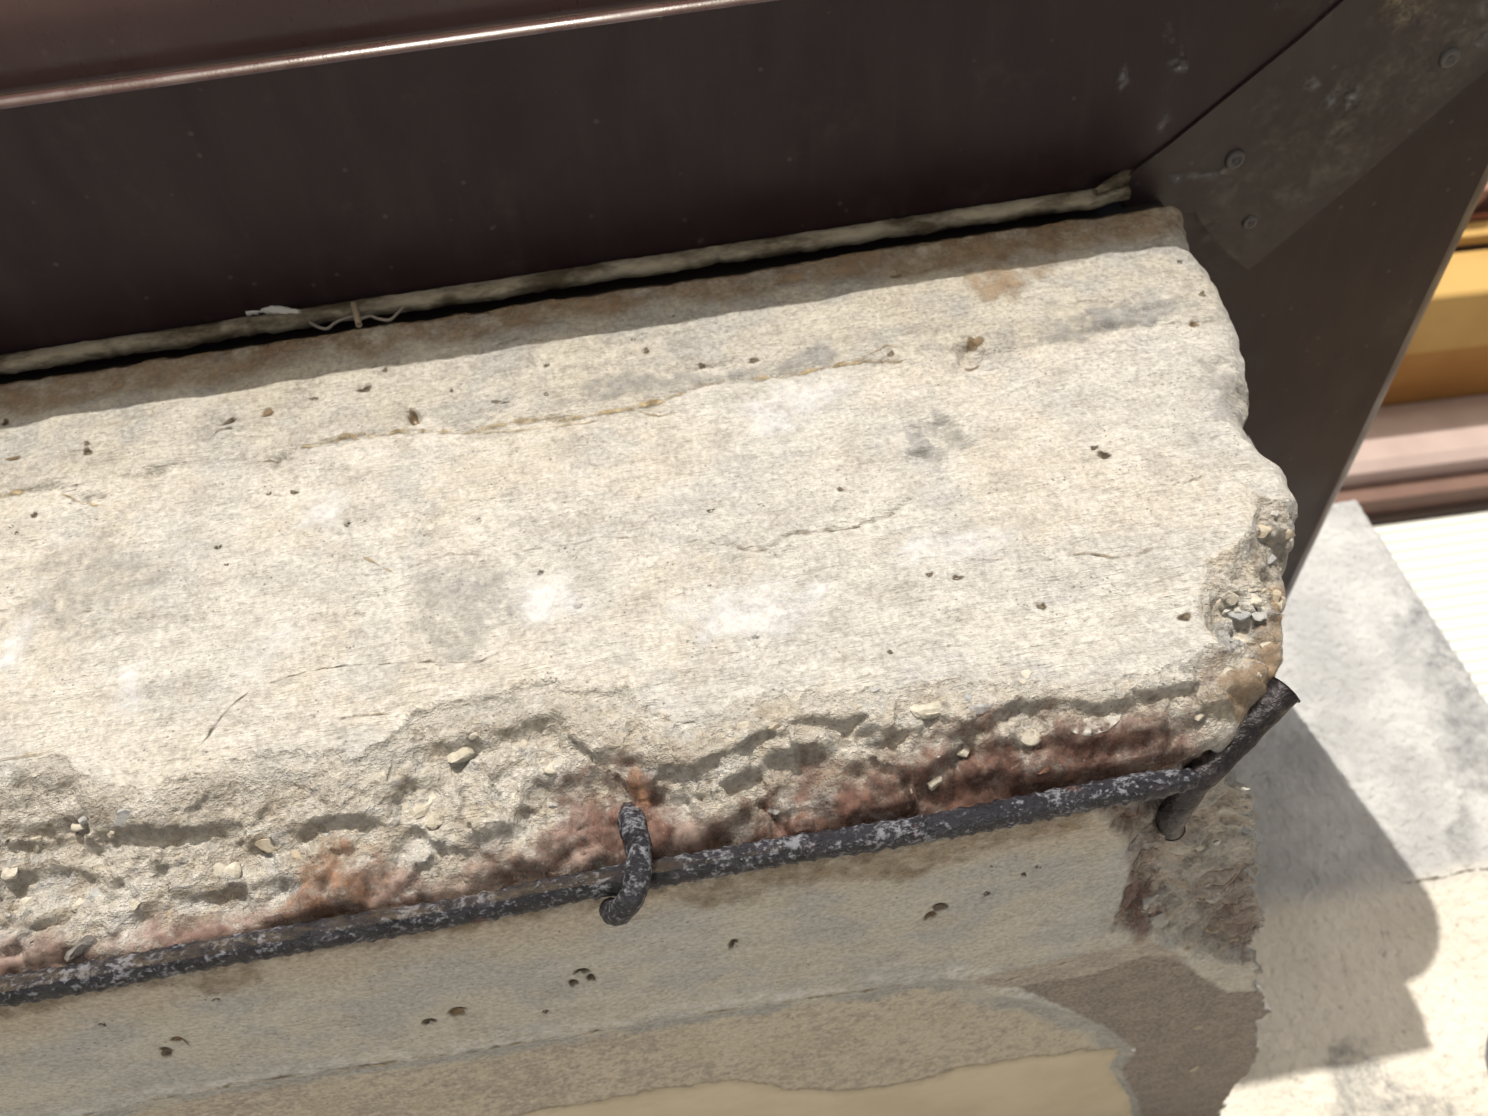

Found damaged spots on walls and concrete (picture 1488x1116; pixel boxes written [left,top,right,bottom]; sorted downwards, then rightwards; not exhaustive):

crack [755,344,903,380]
crack [263,383,719,463]
spalling [0,494,1298,975]
corrosion [748,711,1198,843]
corrosion [112,760,730,985]
spalling [1096,767,1271,1072]
corrosion [0,939,98,1013]
spalling [160,1036,189,1056]
spalling [422,1007,465,1025]
spalling [569,968,595,987]